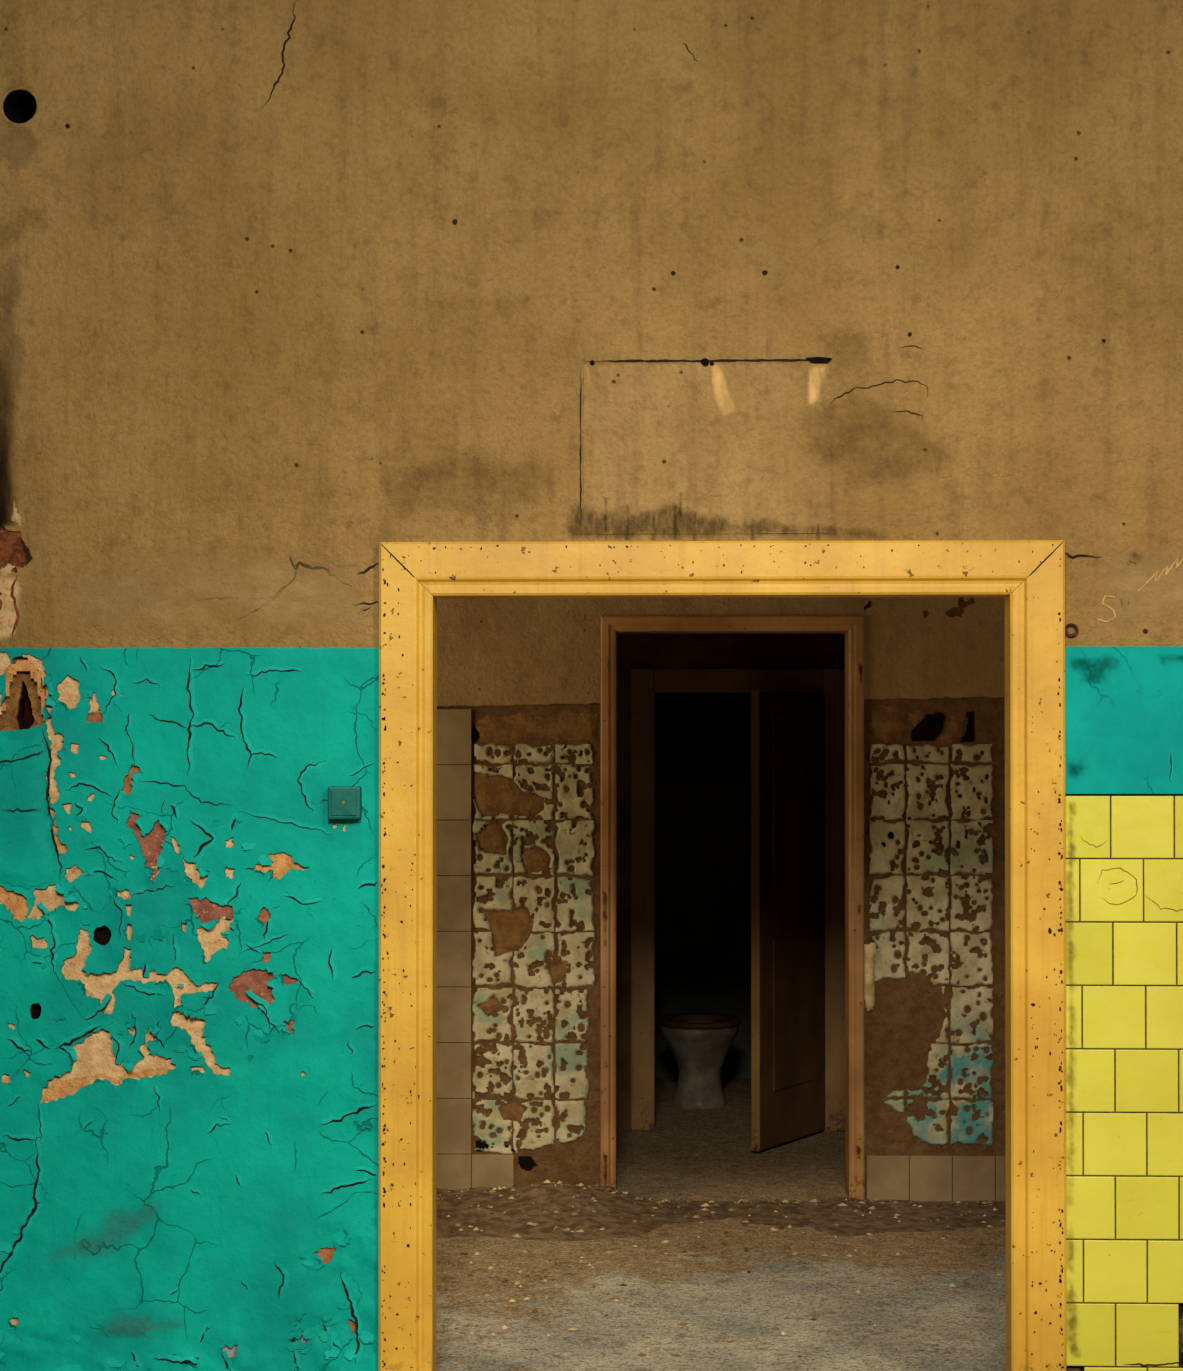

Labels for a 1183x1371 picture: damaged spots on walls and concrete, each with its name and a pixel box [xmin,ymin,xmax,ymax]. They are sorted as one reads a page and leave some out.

spalling [0,500,33,575]
spalling [0,652,123,949]
crack [8,656,378,1065]
peeling [121,765,309,964]
spalling [30,1003,41,1019]
peeling [40,888,298,1103]
crack [322,1022,377,1125]
crack [0,1094,45,1278]
crack [319,1166,377,1196]
peeling [313,1247,336,1265]
crack [241,1261,364,1370]
crack [1128,1360,1183,1368]